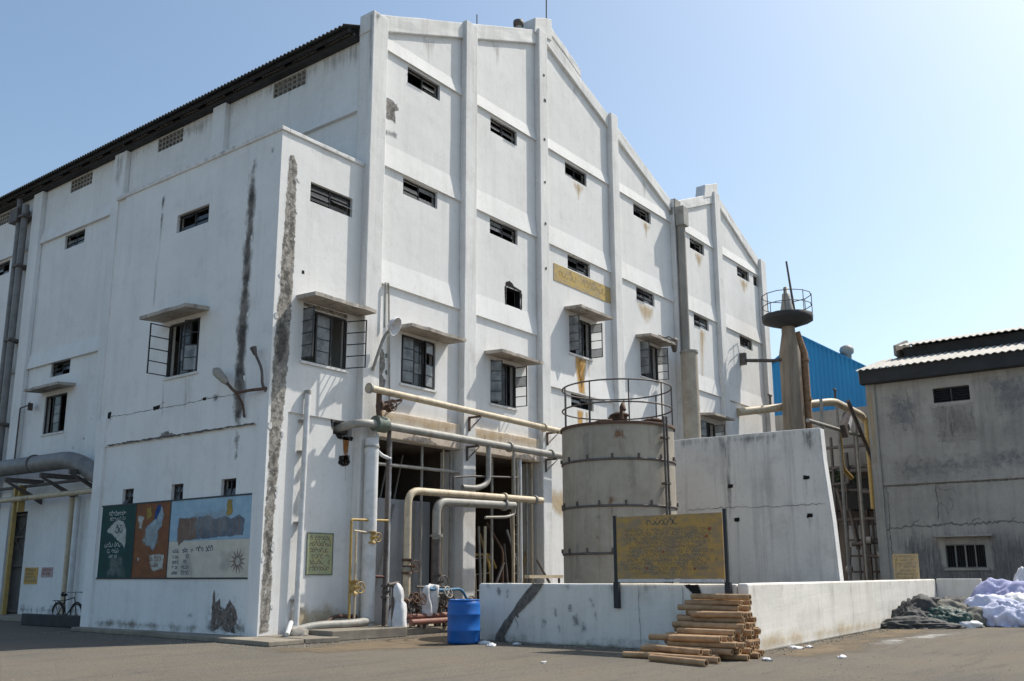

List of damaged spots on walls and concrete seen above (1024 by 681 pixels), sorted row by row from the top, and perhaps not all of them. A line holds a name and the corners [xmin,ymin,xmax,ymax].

spalling [386,98,399,123]
peeling [259,155,301,633]
corrosion [576,357,586,393]
crack [886,483,1024,560]
flaking render [208,590,239,633]